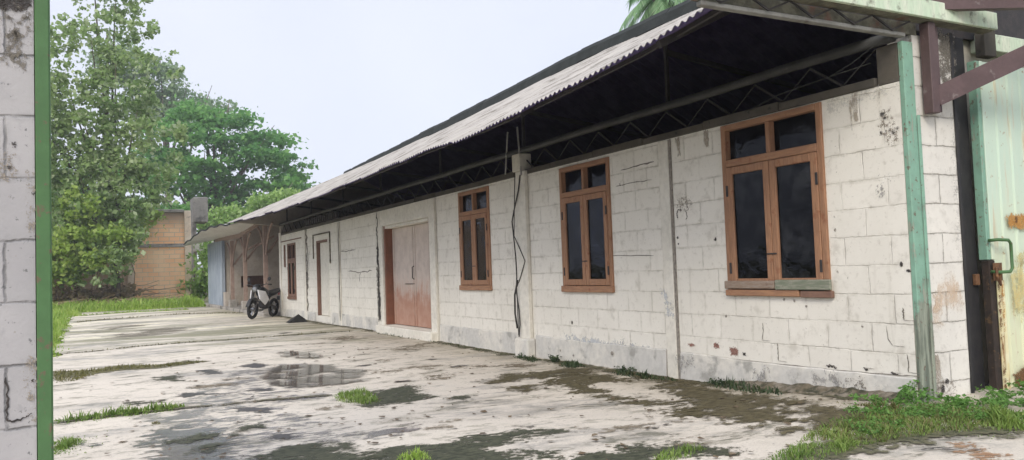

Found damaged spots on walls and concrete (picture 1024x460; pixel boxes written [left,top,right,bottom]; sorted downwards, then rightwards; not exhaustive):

water stain [0,0,34,71]
corrosion [1005,213,1024,230]
crack [70,212,381,353]
corrosion [998,252,1024,389]
crack [4,378,32,423]